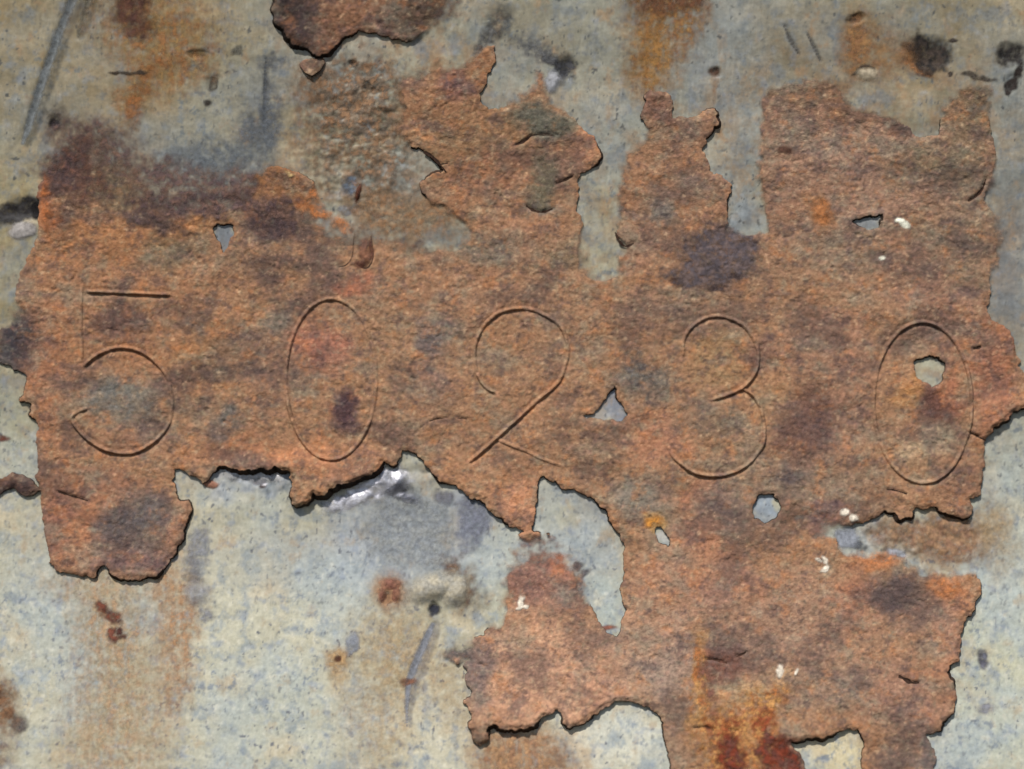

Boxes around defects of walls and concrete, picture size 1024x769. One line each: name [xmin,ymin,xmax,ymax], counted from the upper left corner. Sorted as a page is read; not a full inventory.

corrosion [104,0,214,118]
corrosion [631,0,705,91]
corrosion [270,0,456,237]
corrosion [0,472,39,497]
corrosion [869,516,980,563]
corrosion [375,578,406,607]
corrosion [84,583,139,751]
corrosion [165,601,195,686]
corrosion [691,647,715,688]
corrosion [480,733,567,769]
corrosion [696,689,714,724]
corrosion [705,692,800,769]